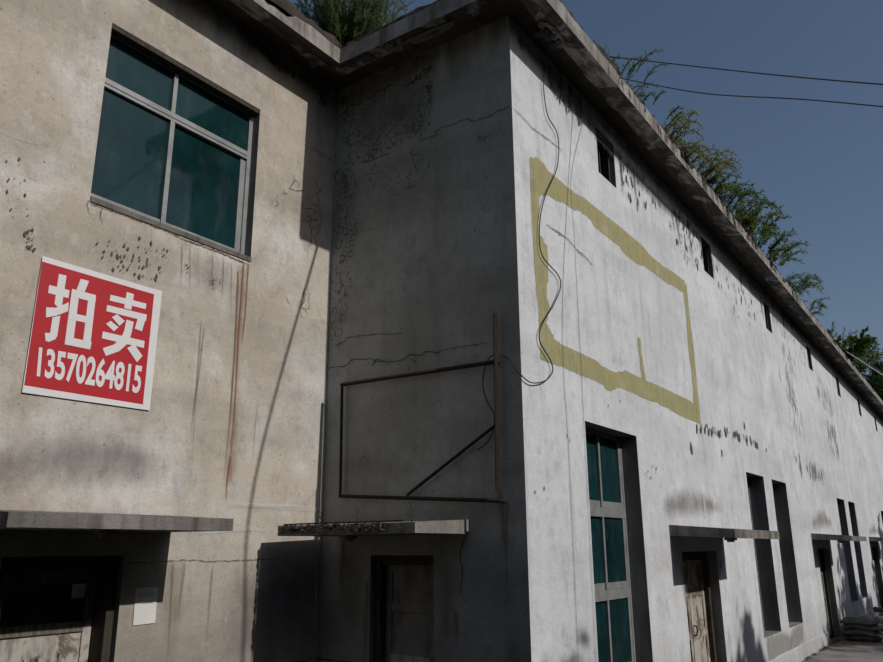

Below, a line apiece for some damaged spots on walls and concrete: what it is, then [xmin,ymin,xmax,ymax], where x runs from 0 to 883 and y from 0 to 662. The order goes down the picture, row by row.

crack [275,106,562,369]
leakage [520,40,692,249]
corrosion [228,264,249,436]
spalling [278,520,404,534]